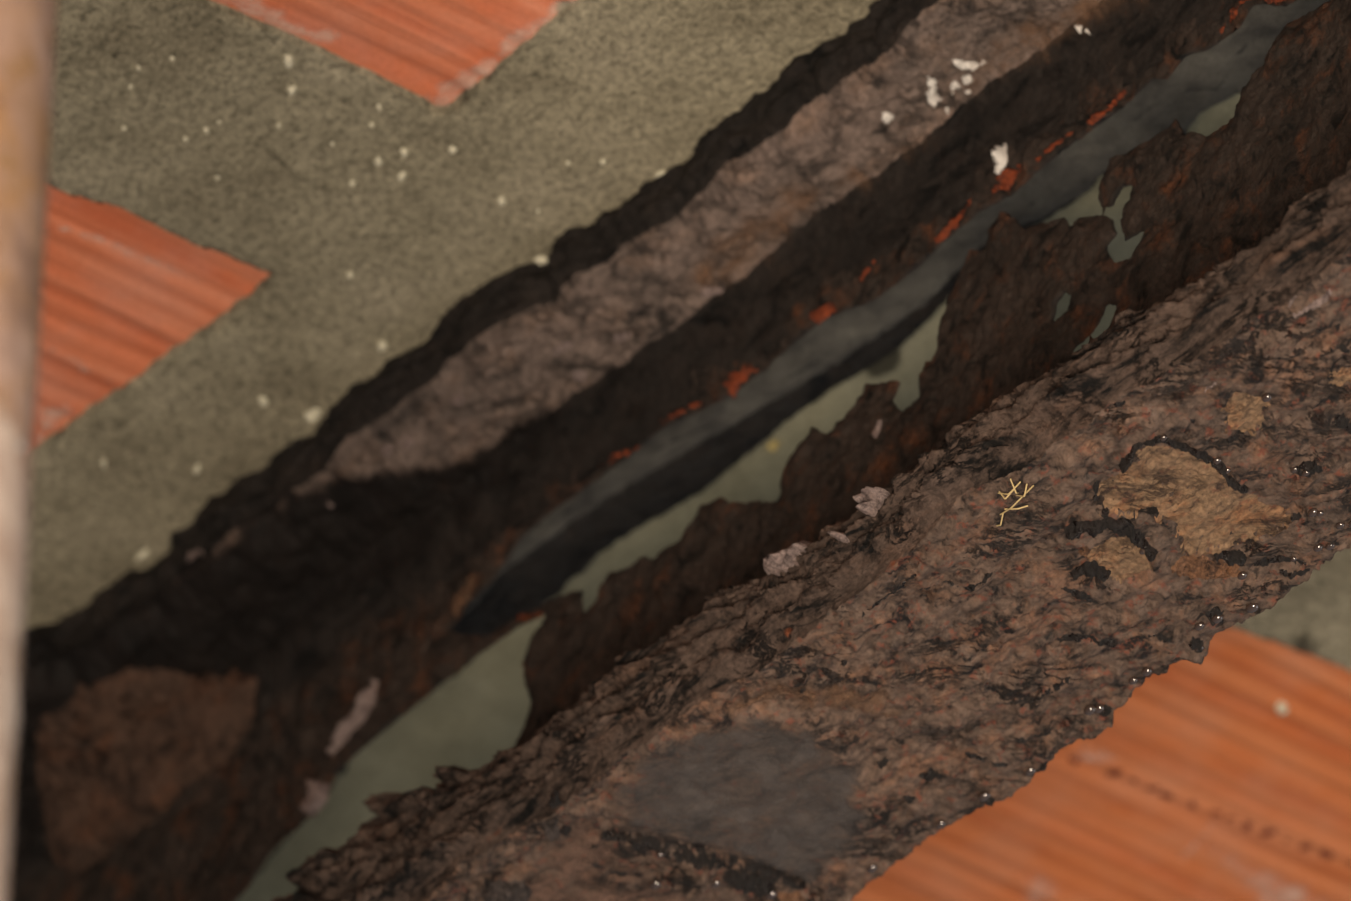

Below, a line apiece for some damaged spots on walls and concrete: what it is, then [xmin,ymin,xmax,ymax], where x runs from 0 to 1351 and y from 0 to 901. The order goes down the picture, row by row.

rust [990,90,1127,194]
rust [934,198,971,243]
rust [723,364,758,399]
spalling [304,408,321,423]
rust [1220,392,1272,436]
spalling [1289,460,1322,478]
rust [853,486,890,517]
rust [1064,436,1292,584]
spalling [1205,606,1224,626]
rust [9,412,555,865]
spalling [1188,636,1203,653]
spalling [919,767,940,781]